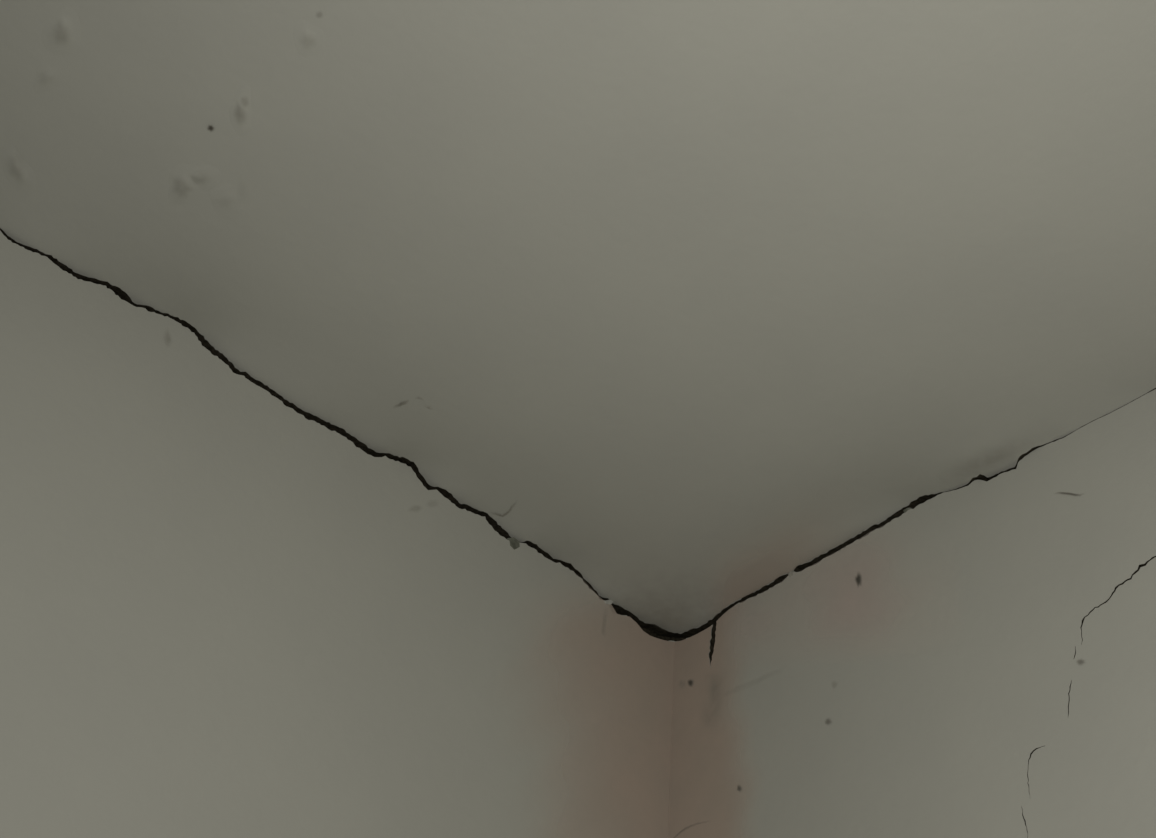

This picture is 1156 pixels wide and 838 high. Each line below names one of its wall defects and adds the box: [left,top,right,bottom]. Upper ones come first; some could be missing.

crack [0,228,1156,666]
crack [1068,556,1156,715]
crack [1021,746,1043,838]